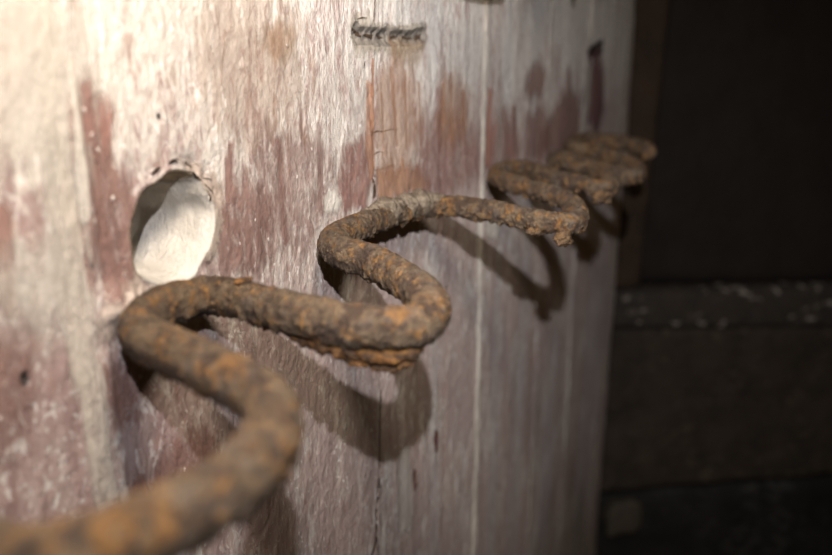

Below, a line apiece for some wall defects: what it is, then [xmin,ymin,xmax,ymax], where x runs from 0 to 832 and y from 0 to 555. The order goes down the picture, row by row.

spalling [65,78,287,340]
crack [371,390,382,555]